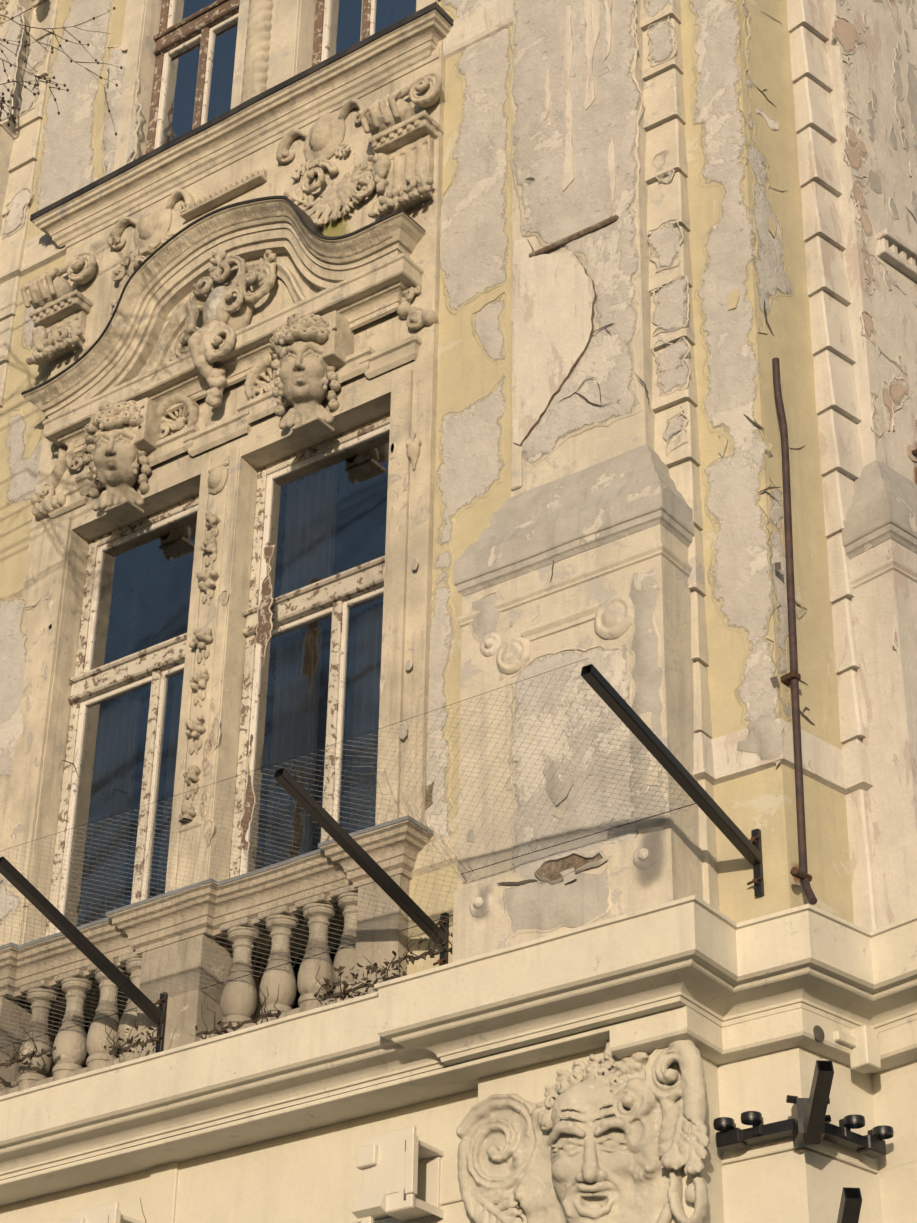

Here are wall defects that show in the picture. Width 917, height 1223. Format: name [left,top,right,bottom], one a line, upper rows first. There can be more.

spalling [0,0,142,239]
peeling [831,0,917,295]
peeling [860,311,876,345]
peeling [389,429,415,459]
crack [560,377,611,406]
spalling [411,0,806,842]
peeling [871,355,910,437]
peeling [254,545,276,665]
spalling [0,597,49,779]
peeling [240,734,255,857]
spalling [499,565,669,938]